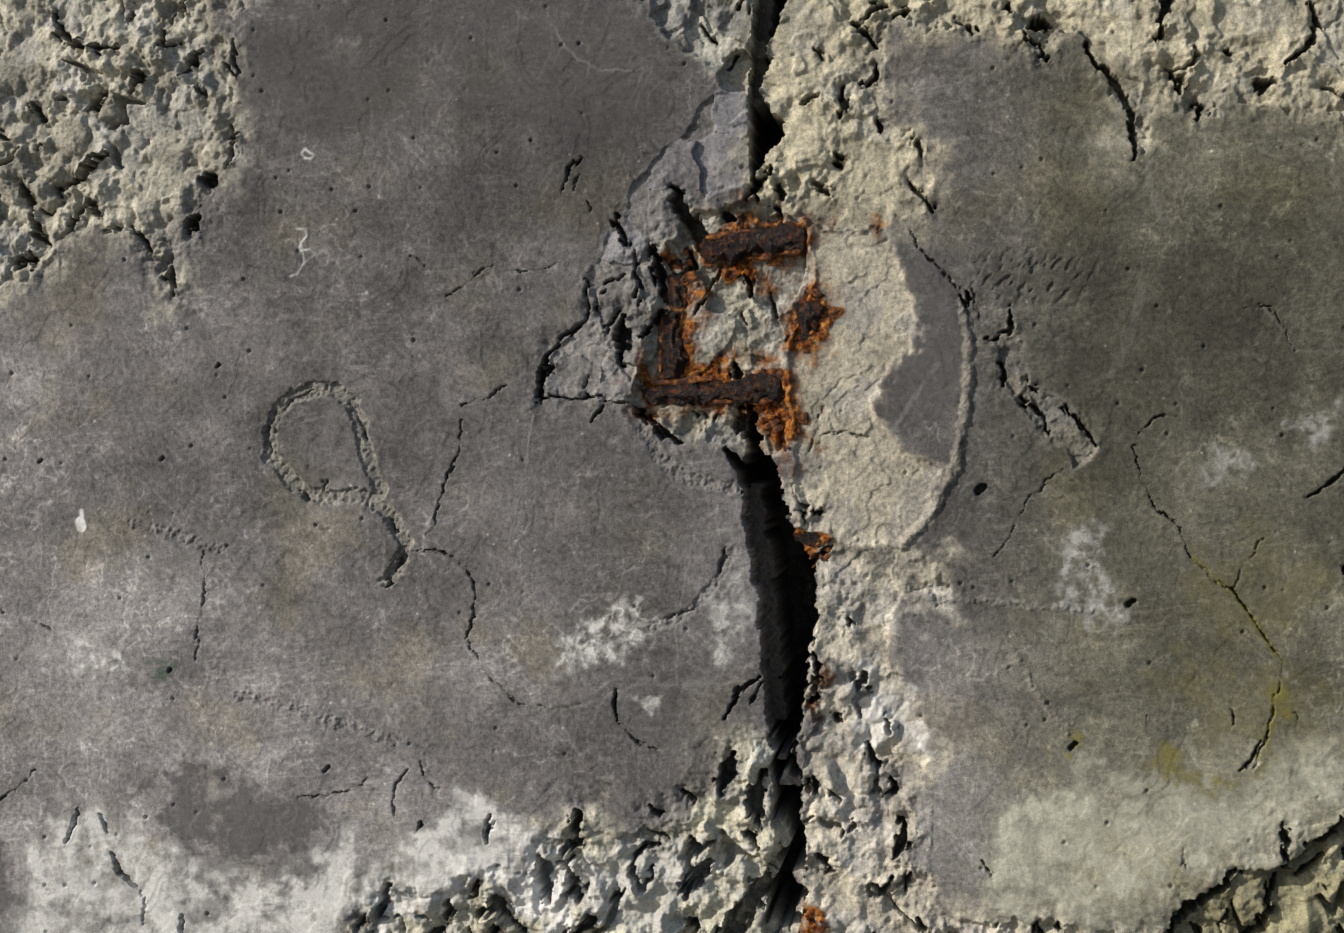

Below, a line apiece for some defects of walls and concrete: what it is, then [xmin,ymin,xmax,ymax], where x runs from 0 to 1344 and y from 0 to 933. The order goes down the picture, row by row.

spalling [0,0,262,293]
crack [408,384,659,752]
rust [635,364,666,421]
rust [660,212,814,384]
rust [689,284,845,452]
rust [794,528,833,568]
spalling [541,0,1344,933]
crack [910,230,996,337]
crack [1132,414,1301,772]
crack [723,675,767,721]
spalling [360,732,780,933]
rust [797,900,829,933]